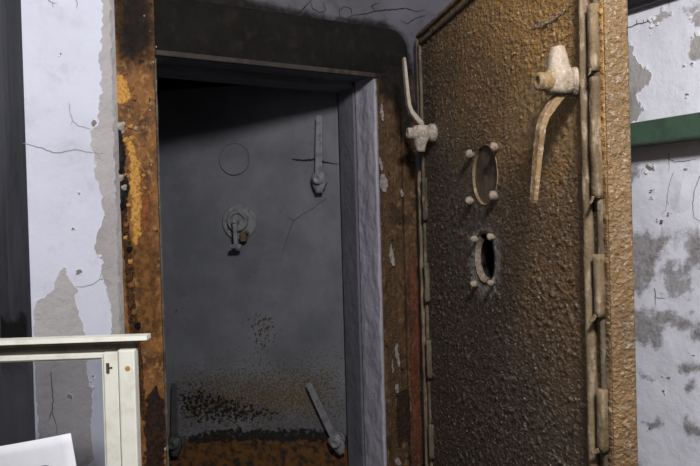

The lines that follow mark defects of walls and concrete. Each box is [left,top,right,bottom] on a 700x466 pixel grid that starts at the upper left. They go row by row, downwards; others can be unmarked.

crack [290,1,426,24]
peeling [628,41,652,123]
crack [23,143,104,160]
peeling [33,267,86,337]
peeling [35,360,96,466]
peeling [89,0,166,466]
corrosion [131,171,160,335]
corrosion [168,313,349,466]
corrosion [409,255,421,462]
water stain [633,232,700,297]
water stain [635,309,700,347]
water stain [684,417,700,436]